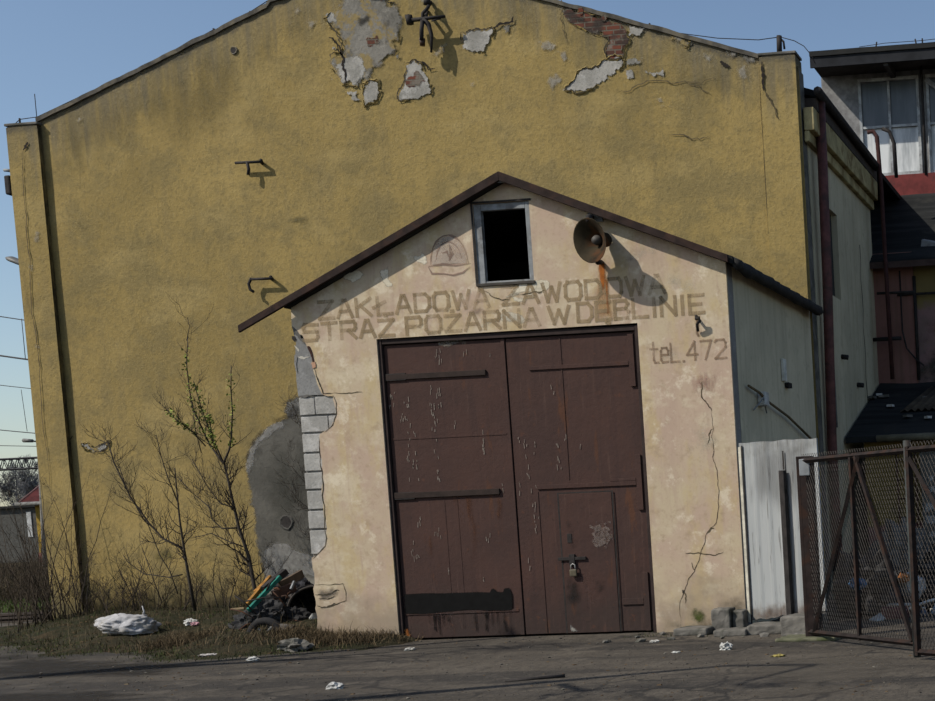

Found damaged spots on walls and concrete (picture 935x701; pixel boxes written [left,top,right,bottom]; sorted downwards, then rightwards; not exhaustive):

peeling [323,0,406,108]
peeling [397,59,435,102]
peeling [460,16,514,54]
peeling [549,7,664,95]
crack [759,62,779,234]
rust [599,263,608,305]
flaking render [292,327,358,558]
crack [679,382,723,626]
flaking render [315,583,346,608]